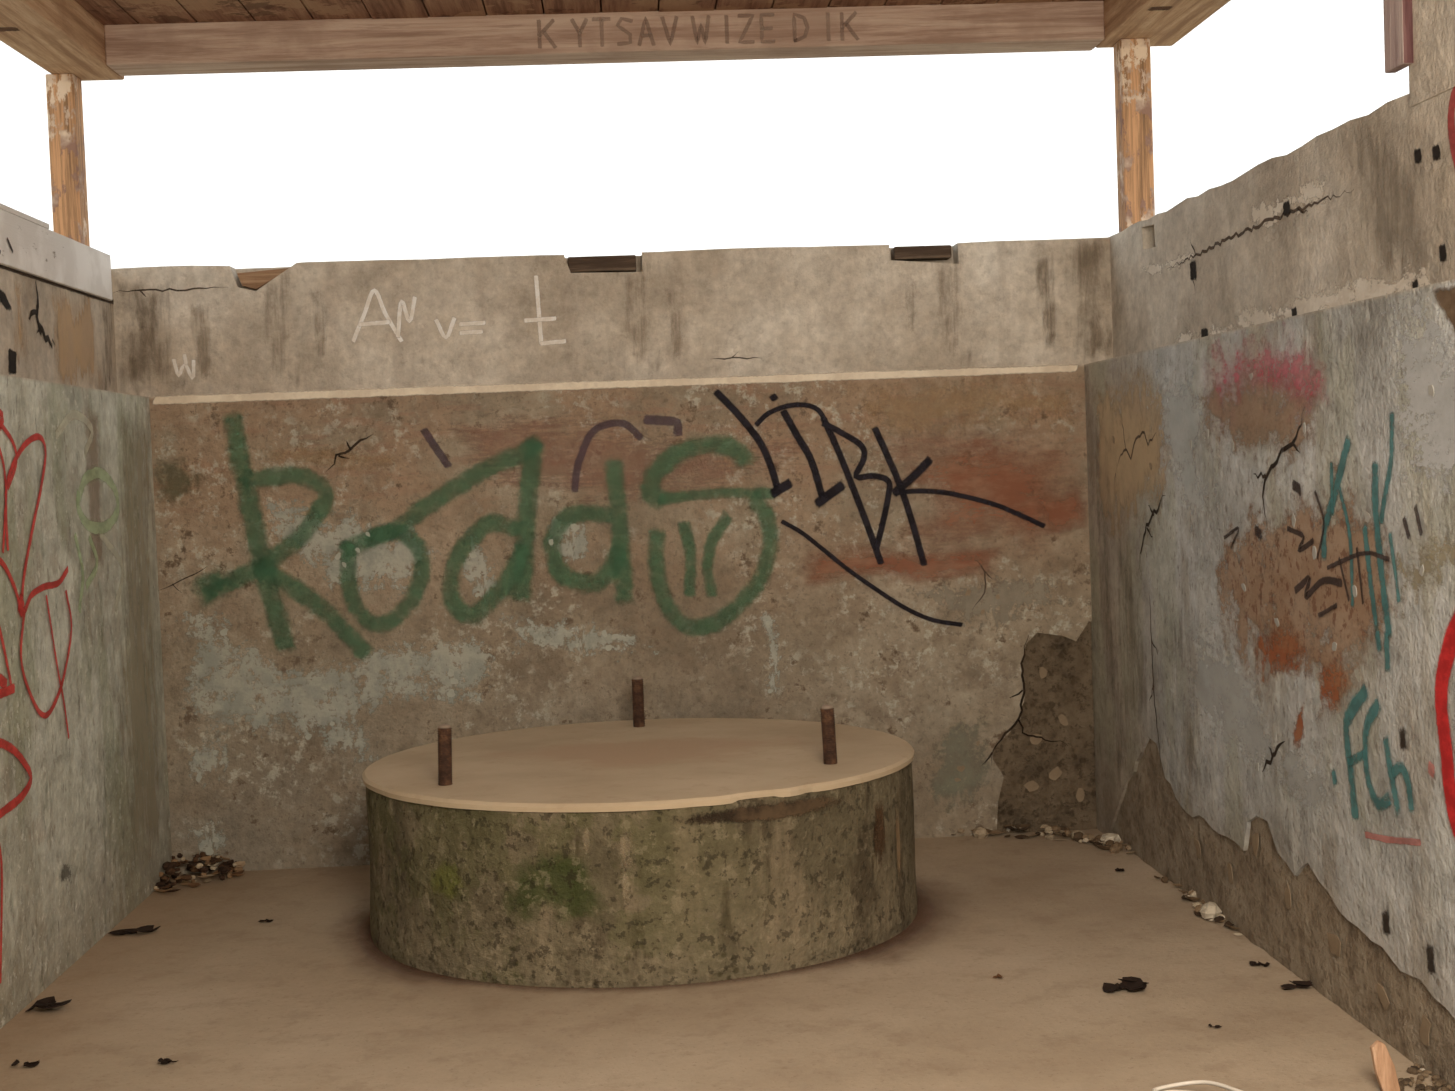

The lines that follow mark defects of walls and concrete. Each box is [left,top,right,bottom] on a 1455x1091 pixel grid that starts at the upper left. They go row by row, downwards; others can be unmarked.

crack [1167,189,1354,286]
spalling [993,621,1455,1090]